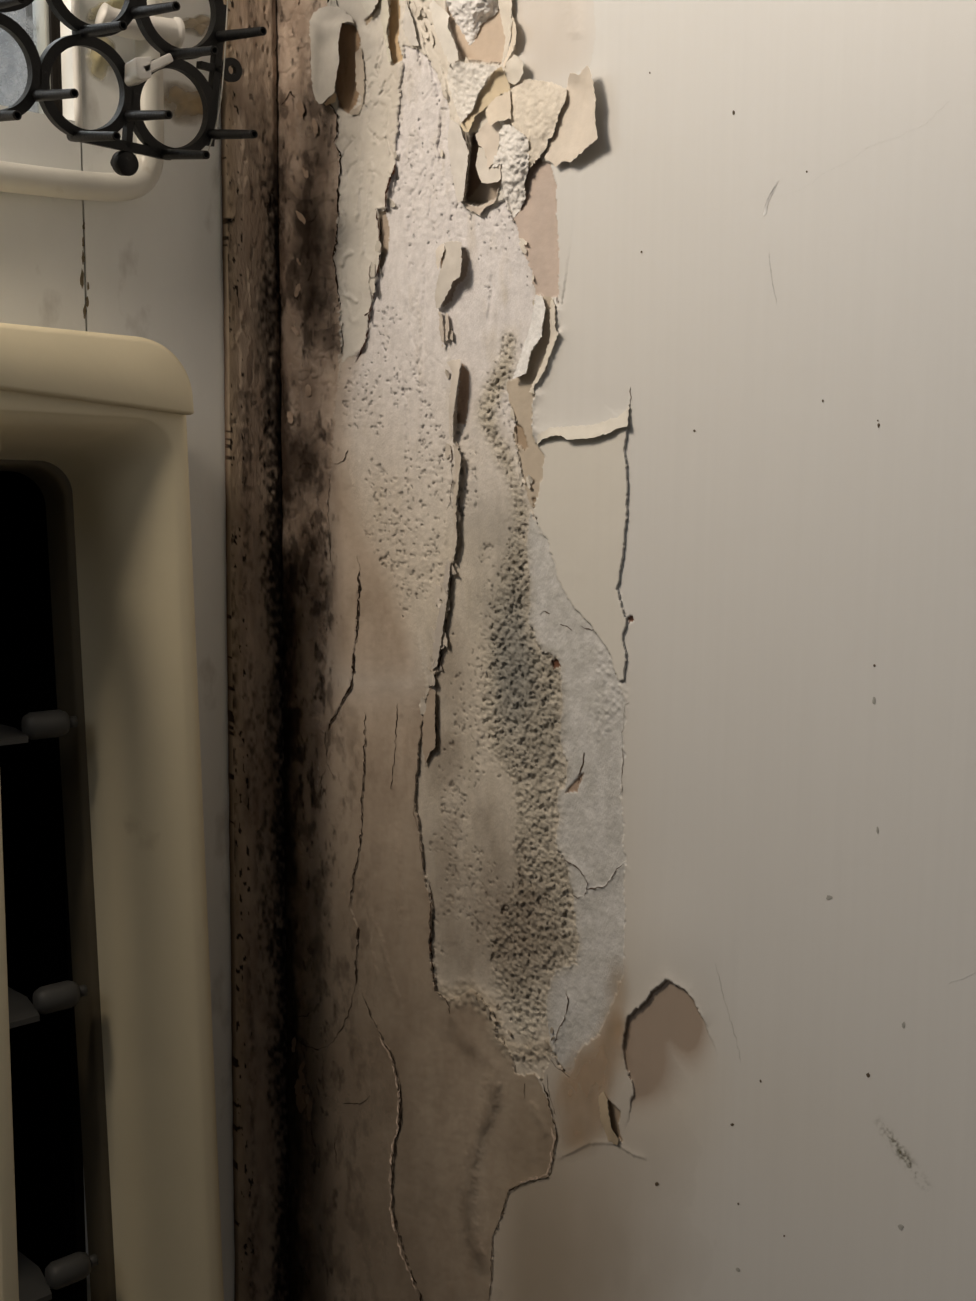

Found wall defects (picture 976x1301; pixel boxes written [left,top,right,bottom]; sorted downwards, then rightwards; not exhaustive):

crack [295,451,450,1301]
leakage [232,0,558,1301]
spalling [309,0,629,1080]
peeling [599,982,717,1145]